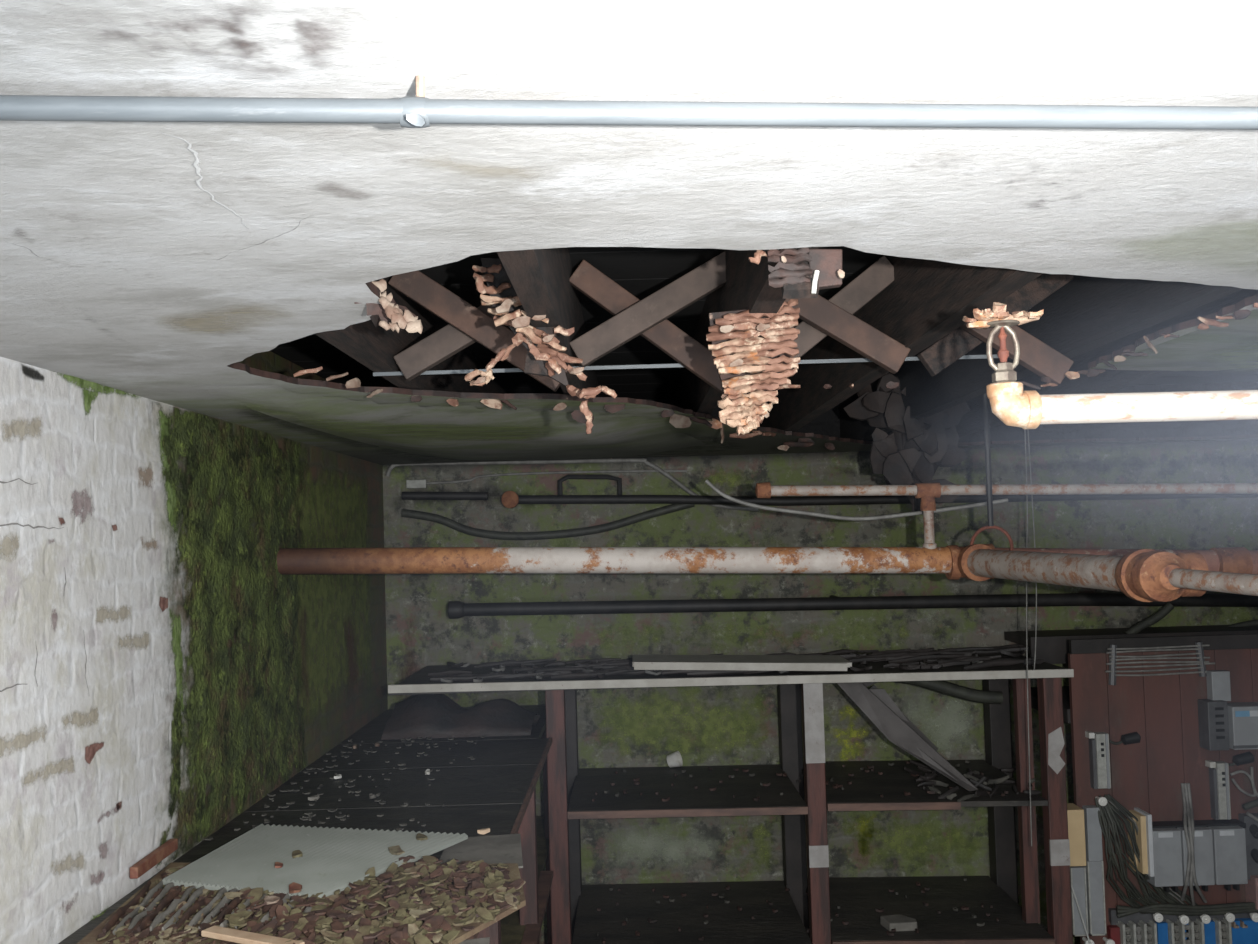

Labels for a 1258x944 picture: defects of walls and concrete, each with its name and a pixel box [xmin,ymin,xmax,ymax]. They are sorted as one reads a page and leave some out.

crack [163,133,249,229]
peeling [354,279,423,334]
peeling [496,299,546,328]
spalling [1197,303,1258,330]
spalling [1018,333,1179,390]
spalling [293,366,383,398]
spalling [480,399,517,410]
spalling [553,402,625,424]
water stain [246,411,478,462]
spalling [661,410,835,451]
crack [0,522,64,530]